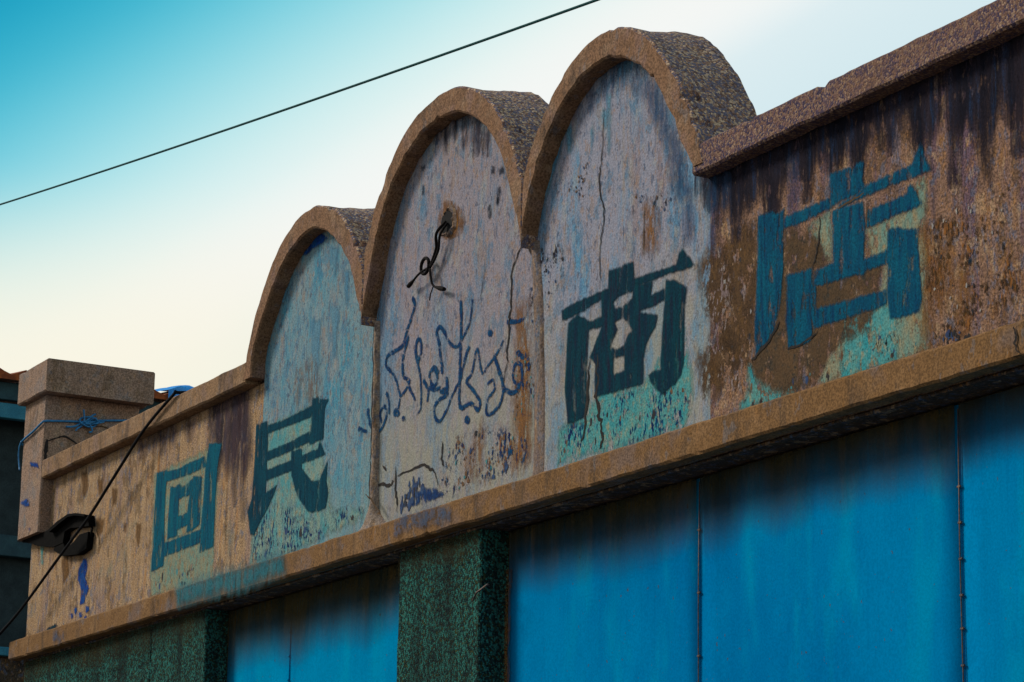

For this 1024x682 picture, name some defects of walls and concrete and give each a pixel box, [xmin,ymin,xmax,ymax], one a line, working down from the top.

crack [597,110,605,283]
water stain [650,33,1024,236]
crack [812,193,867,270]
crack [503,248,531,382]
corrosion [512,308,531,467]
crack [581,355,603,448]
spalling [557,179,1019,464]